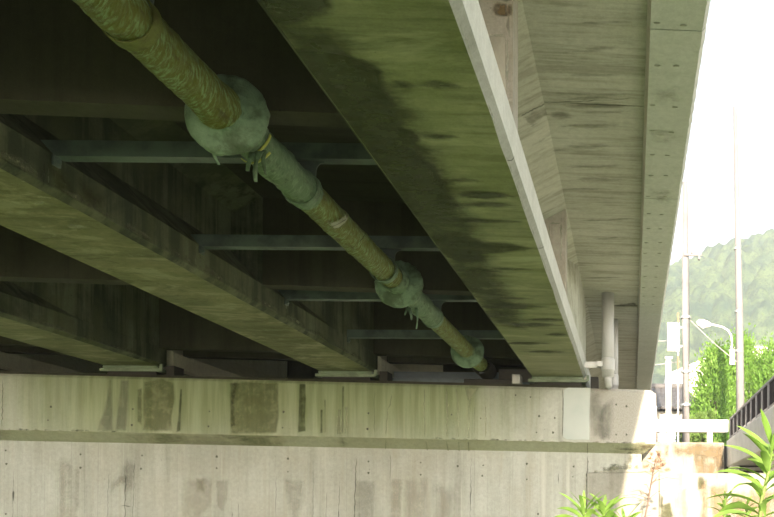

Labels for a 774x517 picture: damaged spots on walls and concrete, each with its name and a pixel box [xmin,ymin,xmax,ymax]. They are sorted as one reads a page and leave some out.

rust [494,3,512,16]
water stain [260,0,564,353]
water stain [138,381,182,439]